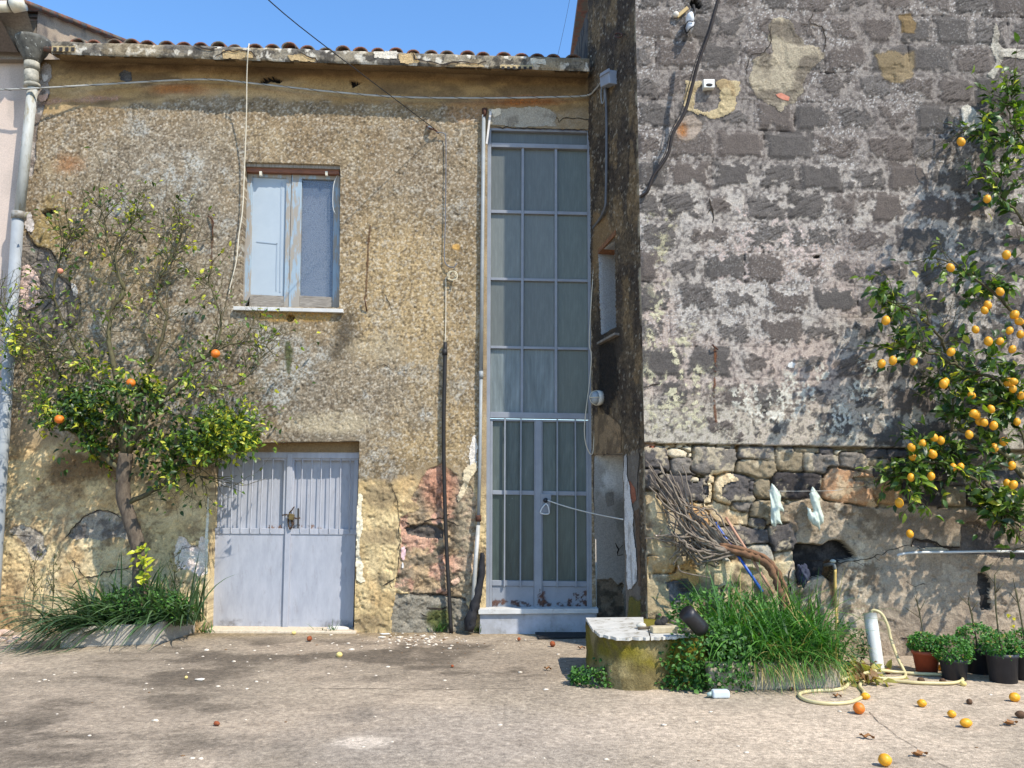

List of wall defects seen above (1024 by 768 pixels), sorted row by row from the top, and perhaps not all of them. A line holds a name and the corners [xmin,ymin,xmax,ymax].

flaking render [9,524,47,561]
flaking render [69,510,128,541]
flaking render [391,435,478,633]
peeling [594,414,637,617]
spalling [792,540,853,586]
crack [788,538,960,591]
corrosion [492,589,587,607]